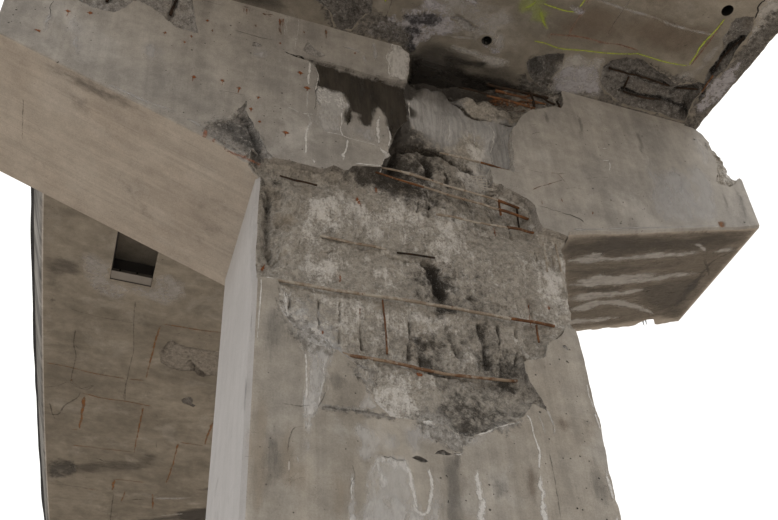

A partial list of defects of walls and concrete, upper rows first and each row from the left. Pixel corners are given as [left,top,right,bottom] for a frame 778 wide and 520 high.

spalling [79,0,198,33]
water stain [307,0,526,172]
spalling [600,16,754,125]
spalling [708,145,737,187]
spalling [202,53,573,437]
water stain [566,225,748,328]
spalling [159,340,219,377]
water stain [349,457,437,520]